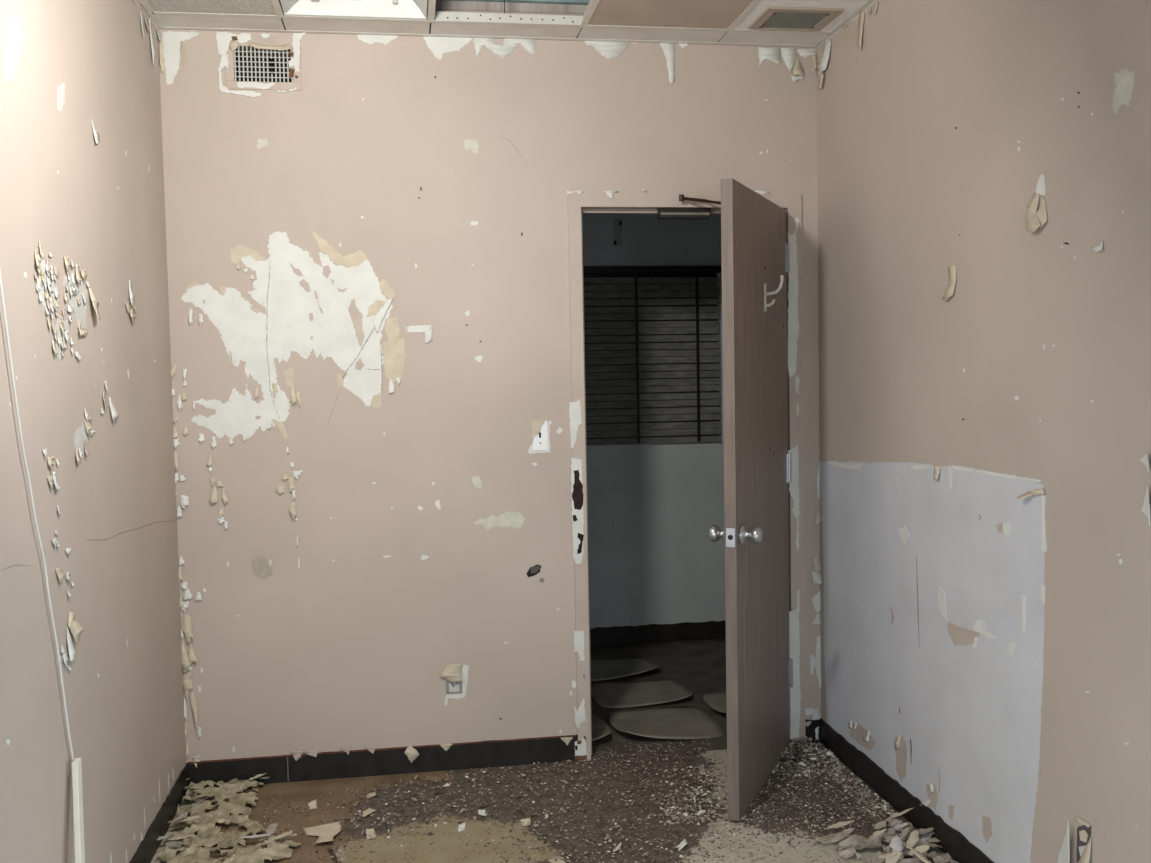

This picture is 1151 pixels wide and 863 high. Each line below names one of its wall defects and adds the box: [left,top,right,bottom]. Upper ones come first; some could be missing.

peeling [357,35,398,45]
peeling [423,36,536,61]
peeling [584,41,688,84]
peeling [1025,174,1047,234]
peeling [24,241,137,361]
peeling [787,217,800,416]
peeling [171,230,432,529]
peeling [474,511,525,530]
peeling [557,400,584,564]
peeling [788,445,800,549]
peeling [179,556,207,768]
peeling [789,461,1047,863]